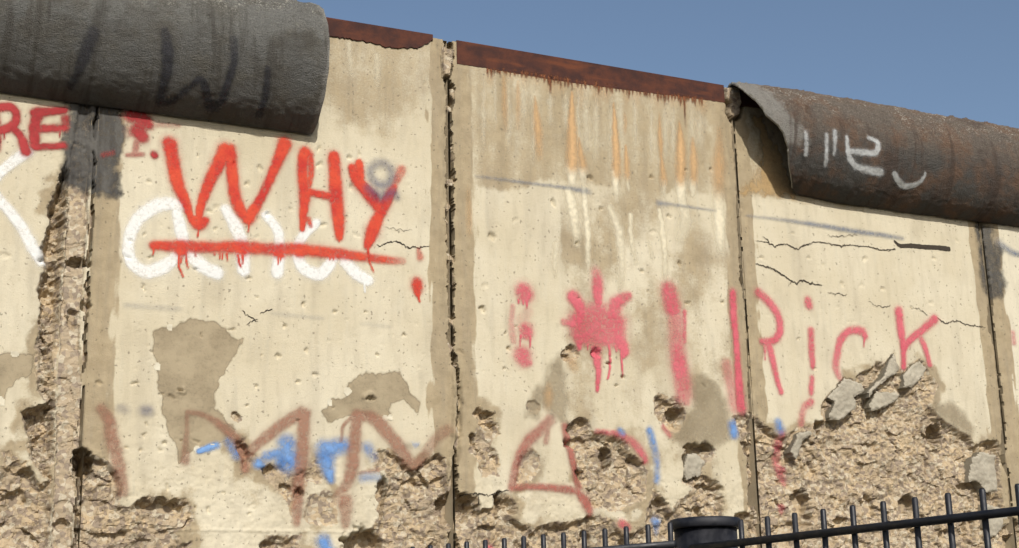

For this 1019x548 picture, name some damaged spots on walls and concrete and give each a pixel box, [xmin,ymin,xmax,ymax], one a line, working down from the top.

rust [487,68,703,182]
spalling [0,157,68,548]
spalling [73,450,196,548]
peeling [153,318,340,548]
peeling [322,371,420,423]
spalling [346,345,1019,548]
crack [755,233,951,296]
crack [869,301,983,328]